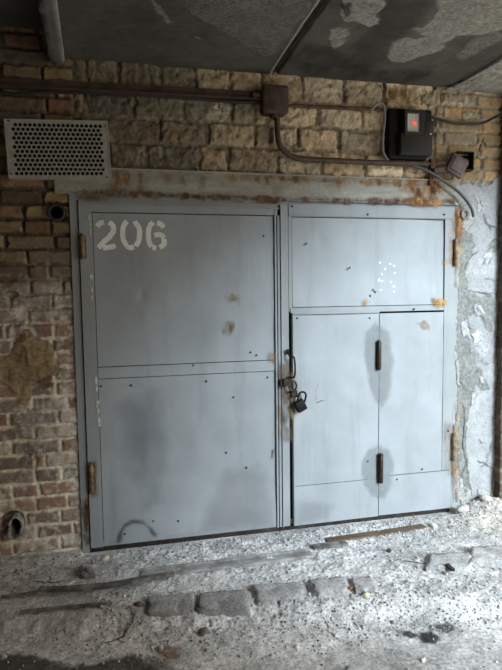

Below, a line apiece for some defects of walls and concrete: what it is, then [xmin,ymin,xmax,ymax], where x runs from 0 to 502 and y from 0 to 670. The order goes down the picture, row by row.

rust [85,171,231,200]
rust [241,195,286,203]
rust [360,179,463,267]
flaking render [455,194,498,506]